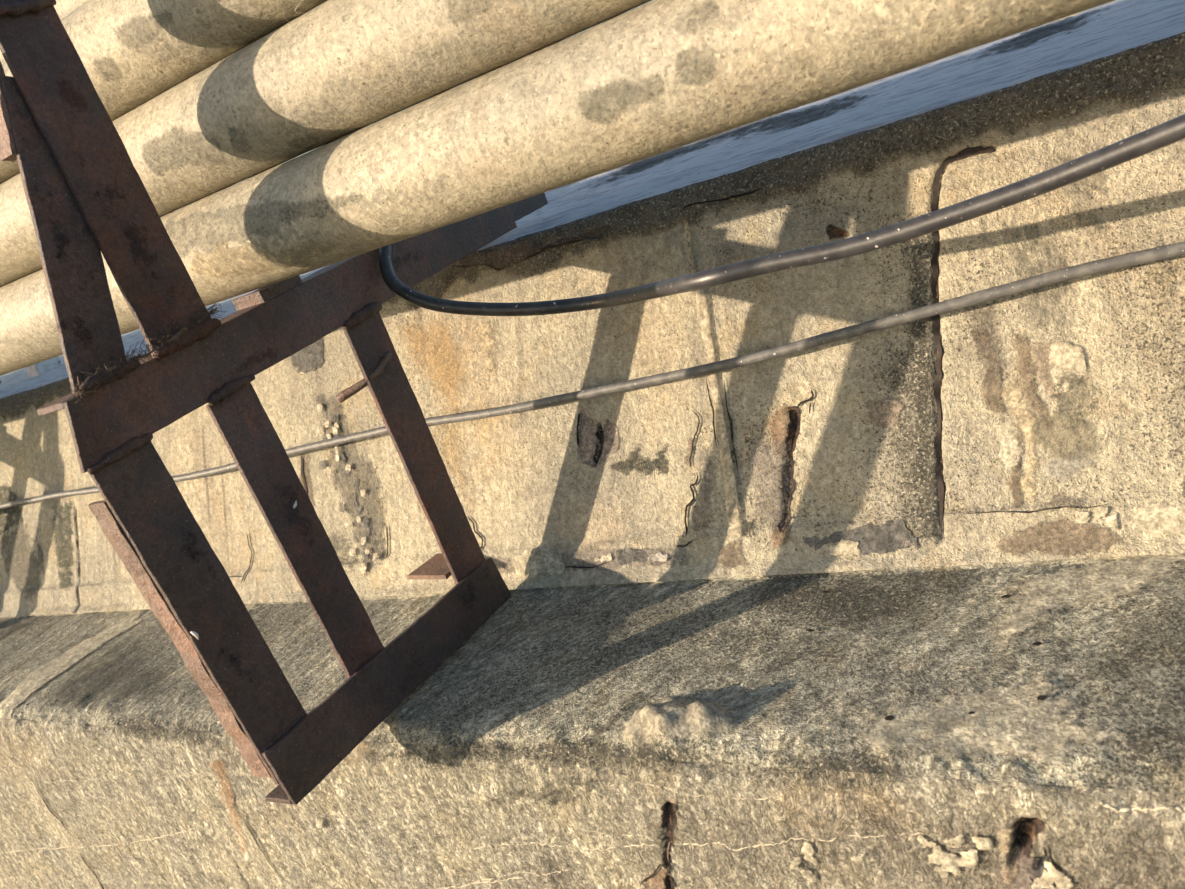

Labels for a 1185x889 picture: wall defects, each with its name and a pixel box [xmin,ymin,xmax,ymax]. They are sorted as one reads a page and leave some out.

crack [931,146,1108,538]
spalling [577,408,619,468]
crack [684,380,734,536]
peeling [748,389,919,557]
water stain [0,525,44,599]
spalling [917,817,1074,889]